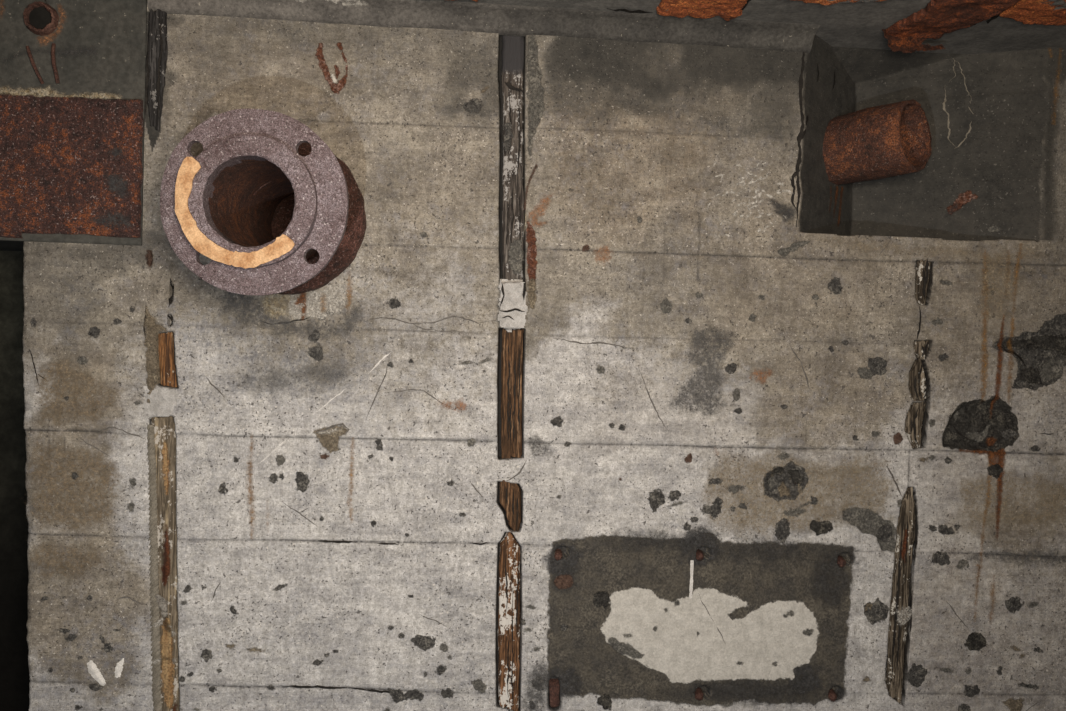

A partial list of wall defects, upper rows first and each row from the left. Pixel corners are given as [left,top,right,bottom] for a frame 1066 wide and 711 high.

corrosion [295,293,306,319]
corrosion [981,252,1021,410]
spalling [993,314,1066,391]
spalling [920,395,1019,479]
corrosion [960,449,1006,537]
peeling [520,453,897,710]